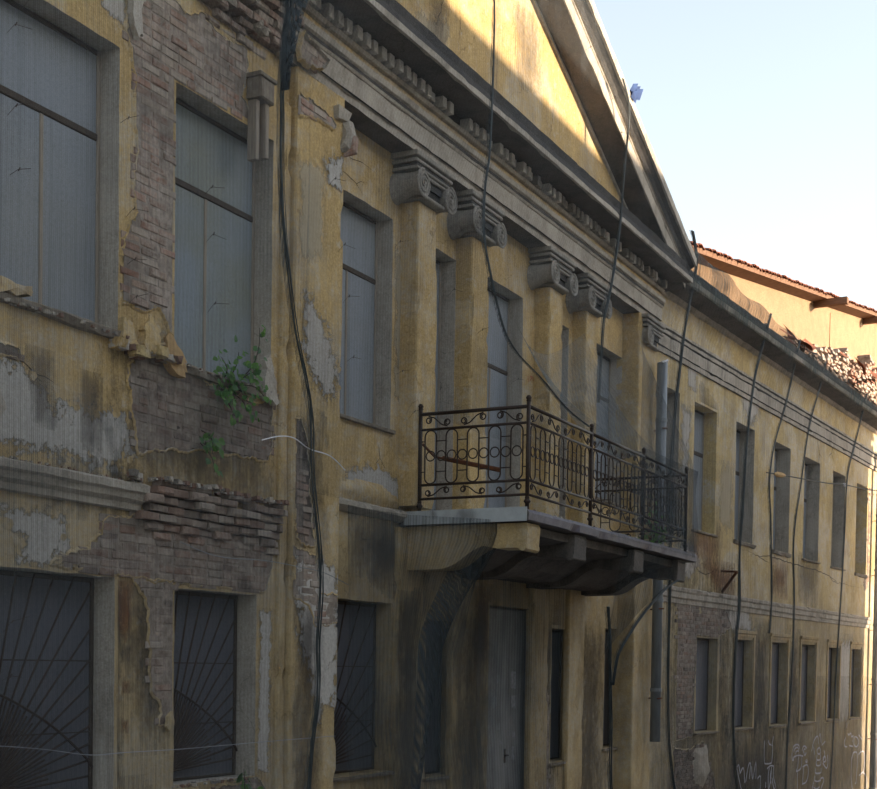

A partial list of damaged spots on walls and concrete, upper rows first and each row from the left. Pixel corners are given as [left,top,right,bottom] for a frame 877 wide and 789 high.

spalling [101,0,249,346]
peeling [321,154,344,196]
spalling [0,339,276,477]
peeling [300,286,341,404]
peeling [292,416,338,726]
peeling [258,610,272,773]
spalling [671,603,755,789]